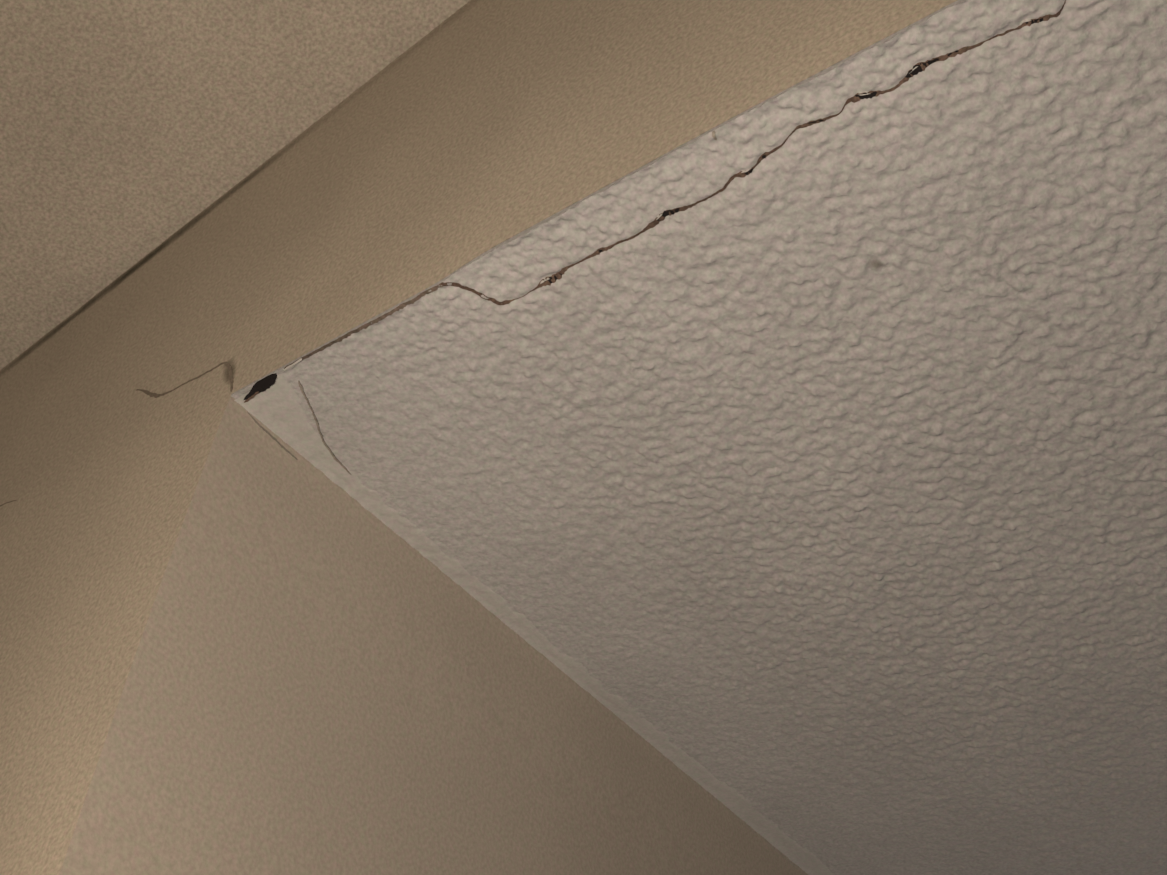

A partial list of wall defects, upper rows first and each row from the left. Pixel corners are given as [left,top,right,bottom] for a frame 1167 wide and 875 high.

crack [136,362,297,460]
crack [284,0,1066,475]